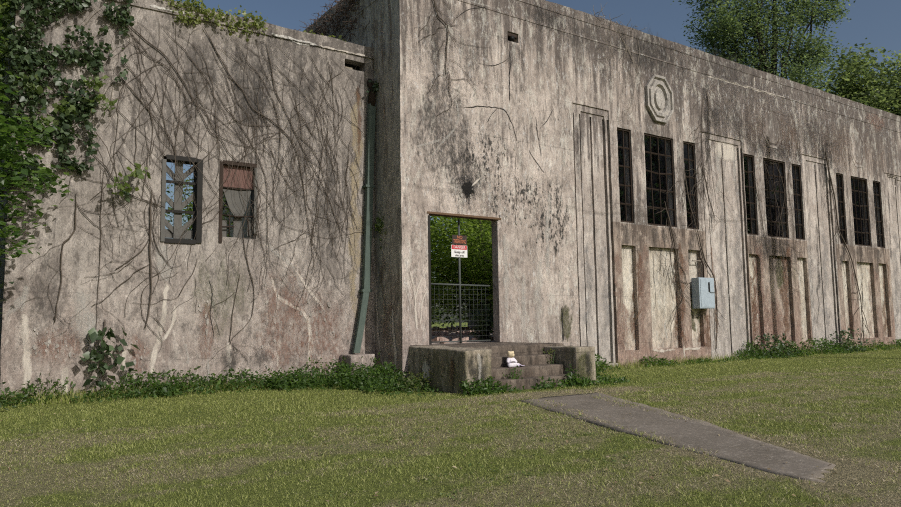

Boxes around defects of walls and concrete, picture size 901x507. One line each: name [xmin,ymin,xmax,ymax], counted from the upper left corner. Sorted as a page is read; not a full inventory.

damp [420,75,484,194]
damp [706,140,740,161]
damp [150,283,176,379]